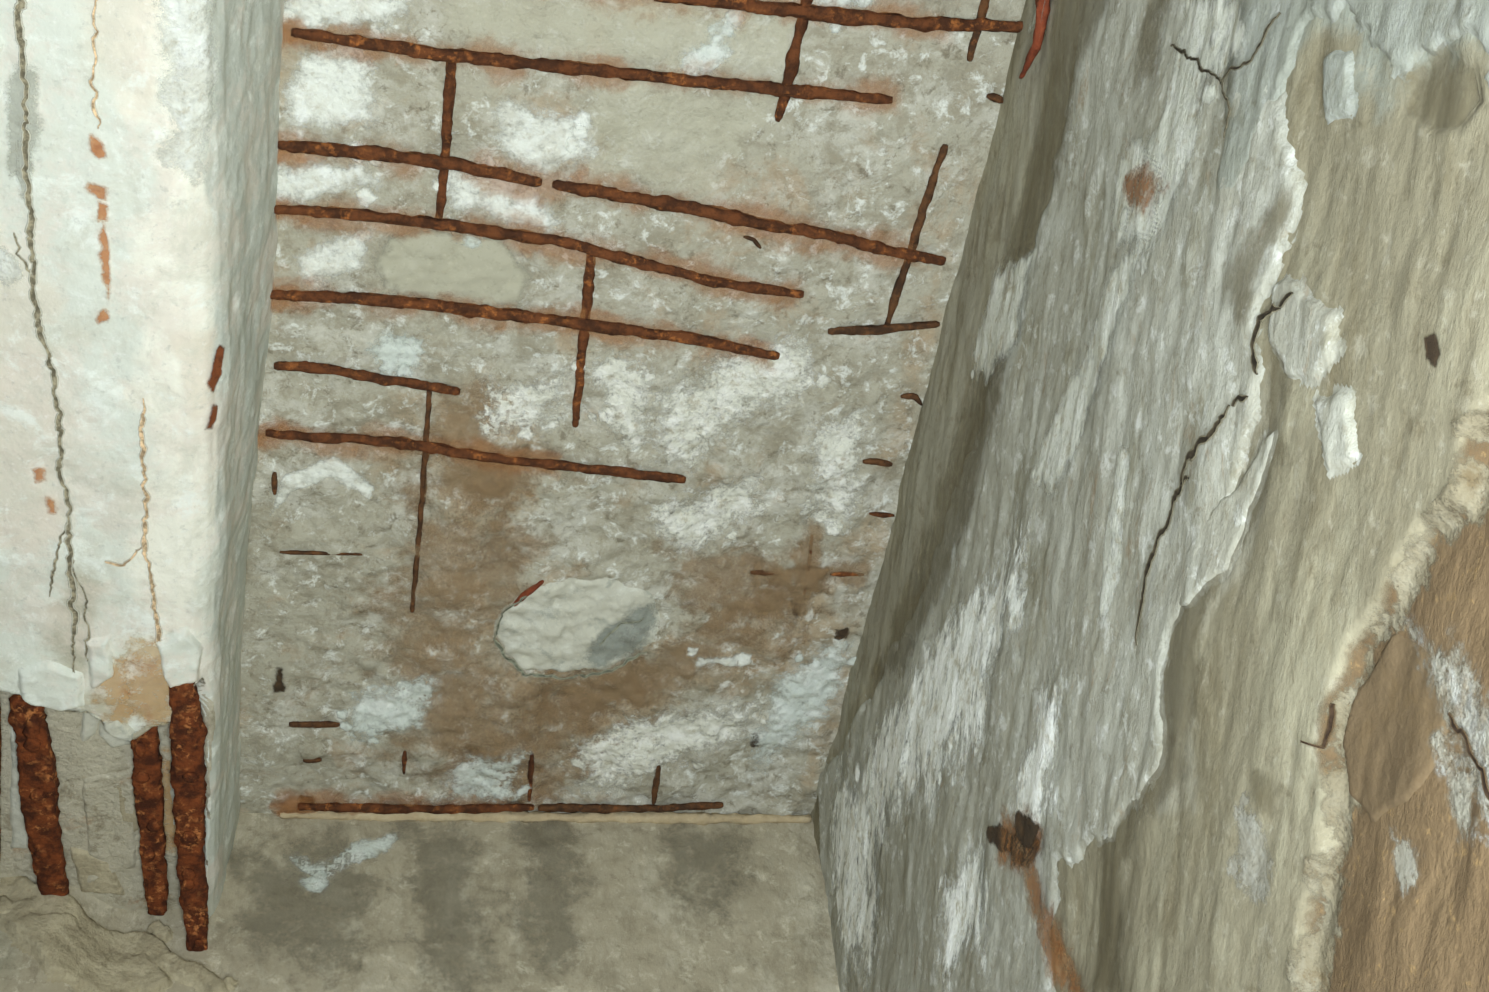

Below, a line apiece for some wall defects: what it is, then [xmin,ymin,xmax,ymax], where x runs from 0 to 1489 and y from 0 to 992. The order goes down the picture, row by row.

corrosion [90,136,105,158]
crack [1170,12,1281,138]
crack [13,0,162,673]
corrosion [88,184,110,323]
peeling [373,230,531,307]
peeling [816,0,1489,992]
crack [1135,292,1293,646]
spalling [0,633,182,910]
peeling [151,627,215,826]
water stain [571,642,856,795]
crack [1447,712,1489,800]
corrosion [998,809,1083,992]